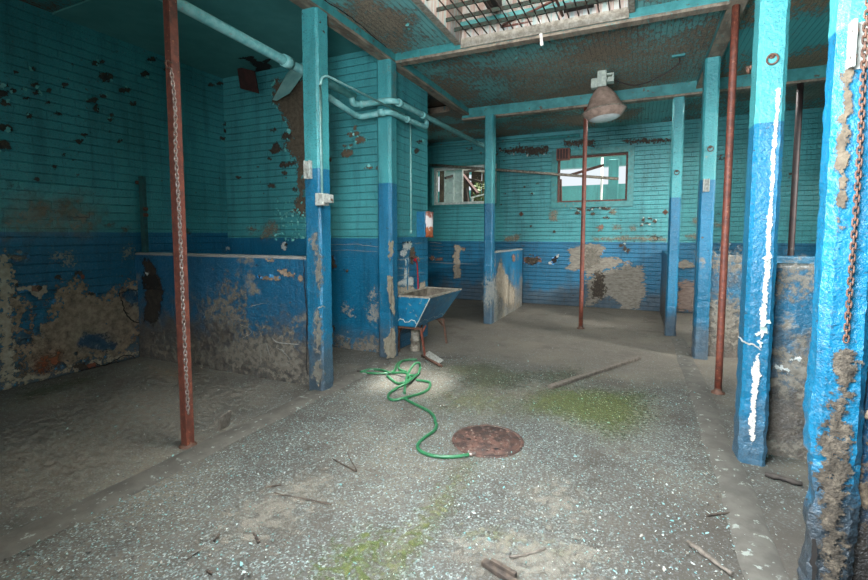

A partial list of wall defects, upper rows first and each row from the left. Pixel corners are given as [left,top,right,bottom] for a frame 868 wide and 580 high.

peeling [0,82,68,116]
peeling [15,249,85,304]
spalling [122,241,165,325]
spalling [249,200,325,297]
spalling [341,240,415,328]
flaking render [452,245,465,279]
flaking render [677,259,695,312]
spalling [748,87,781,441]
spalling [311,310,351,387]
spalling [0,328,751,580]